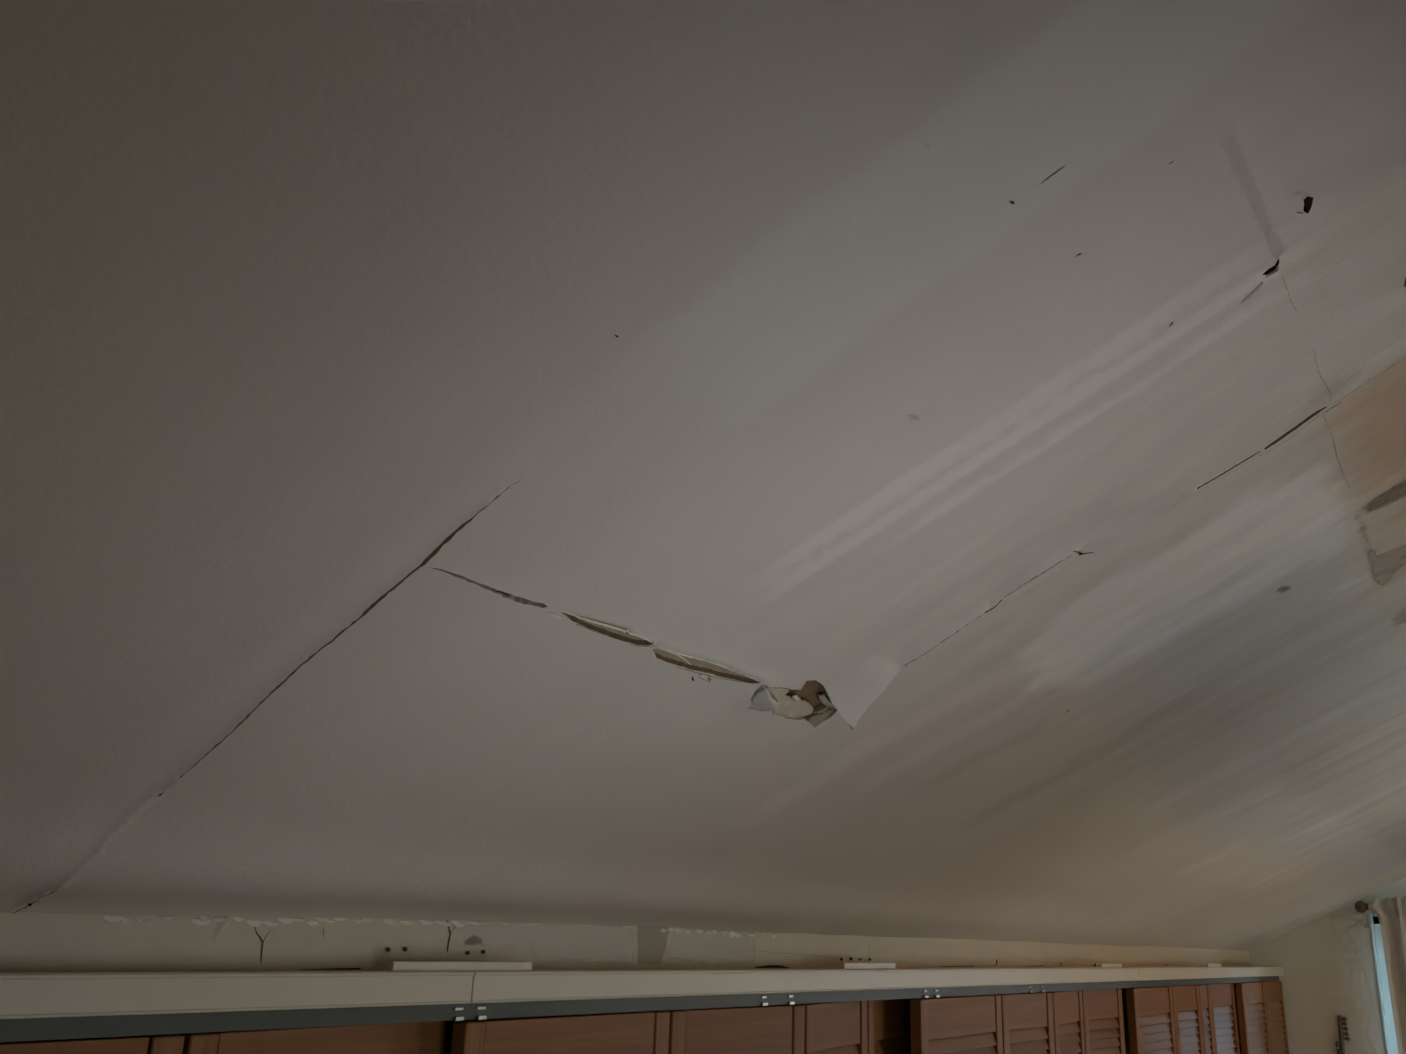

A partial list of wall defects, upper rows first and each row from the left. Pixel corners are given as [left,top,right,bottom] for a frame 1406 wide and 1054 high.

crack [159,481,519,796]
water stain [1365,482,1406,512]